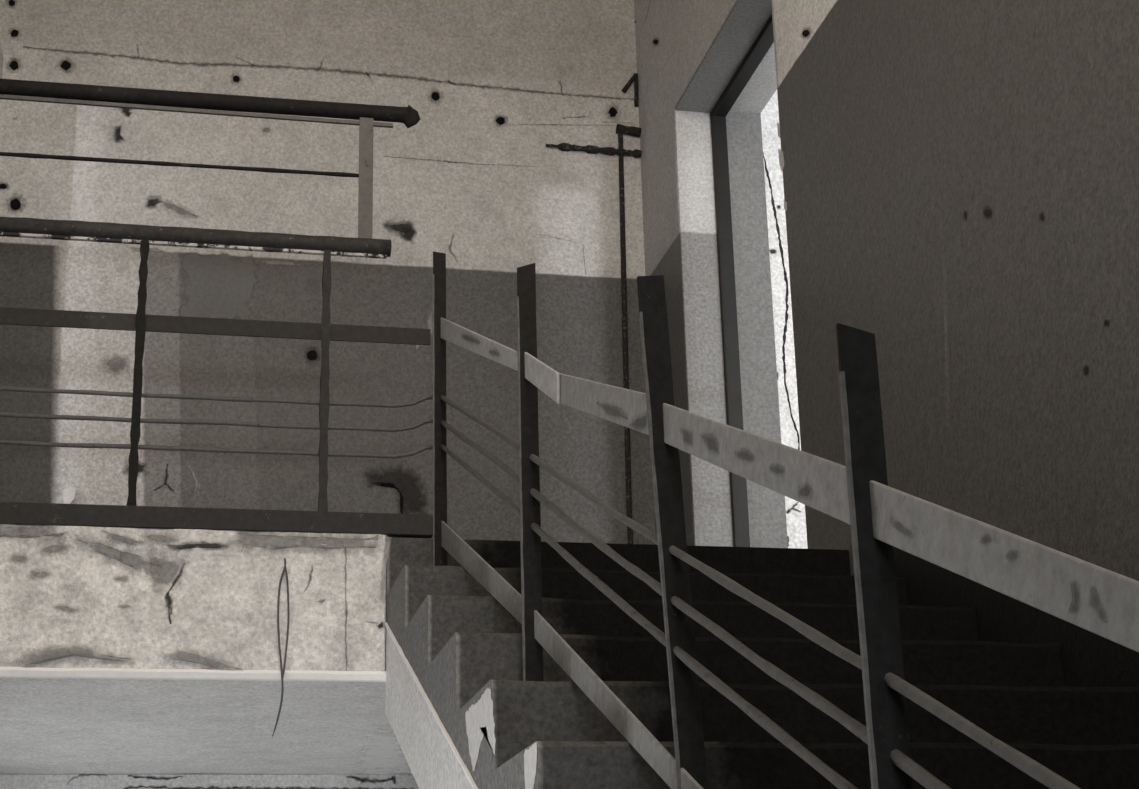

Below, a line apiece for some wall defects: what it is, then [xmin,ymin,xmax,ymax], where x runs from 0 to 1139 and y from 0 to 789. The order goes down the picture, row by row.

crack [27,46,634,126]
crack [165,563,185,624]